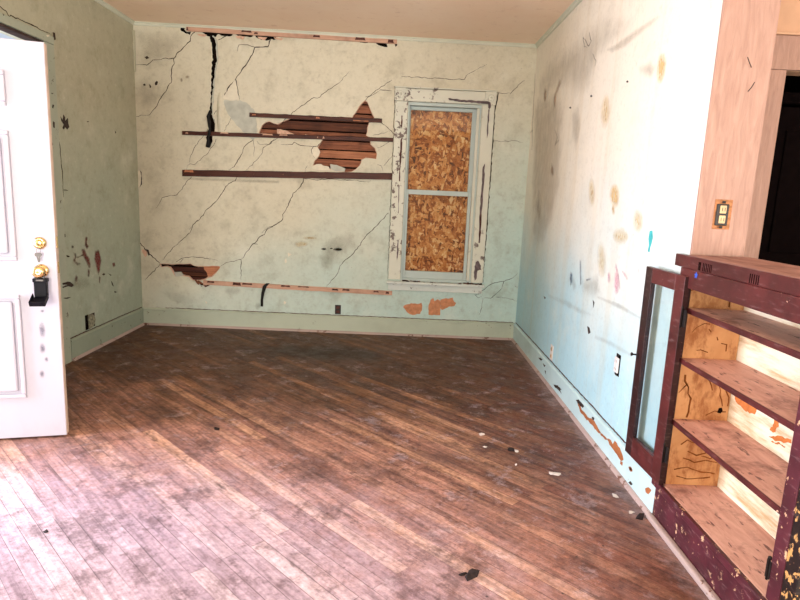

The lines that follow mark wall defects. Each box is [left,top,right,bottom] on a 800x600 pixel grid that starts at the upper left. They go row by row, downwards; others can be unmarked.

spalling [180,27,283,41]
crack [137,32,270,208]
spalling [223,80,377,172]
peeling [448,98,491,136]
crack [140,73,364,280]
spalling [160,263,220,287]
crack [179,65,626,443]
peeling [403,298,456,315]
peeling [576,399,633,485]